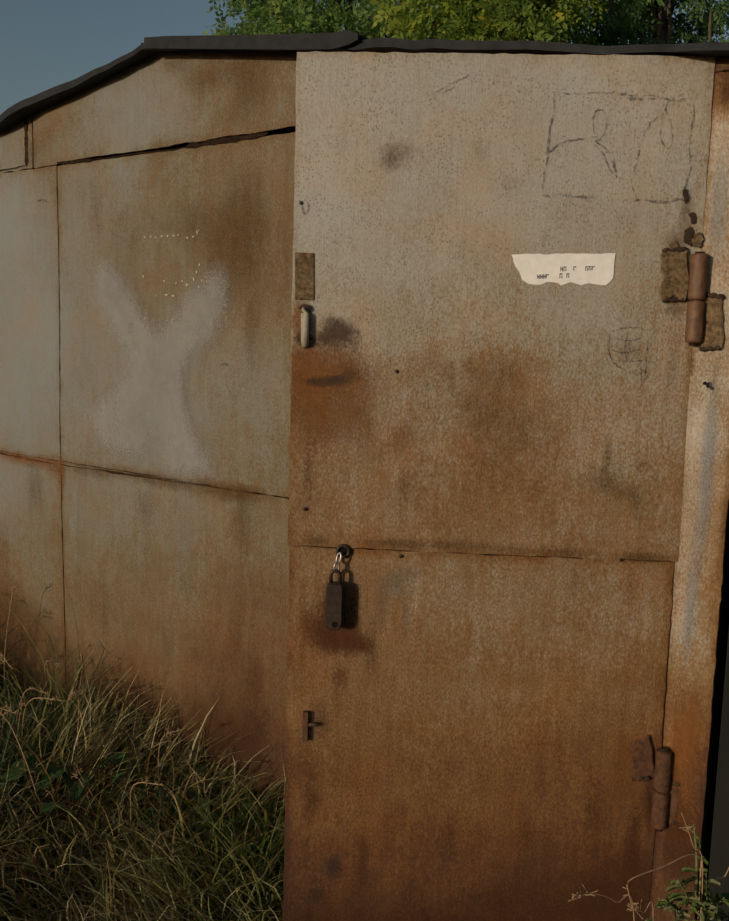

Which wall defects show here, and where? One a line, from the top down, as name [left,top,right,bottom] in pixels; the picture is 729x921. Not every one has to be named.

rust [292,305,364,440]
rust [306,593,370,653]